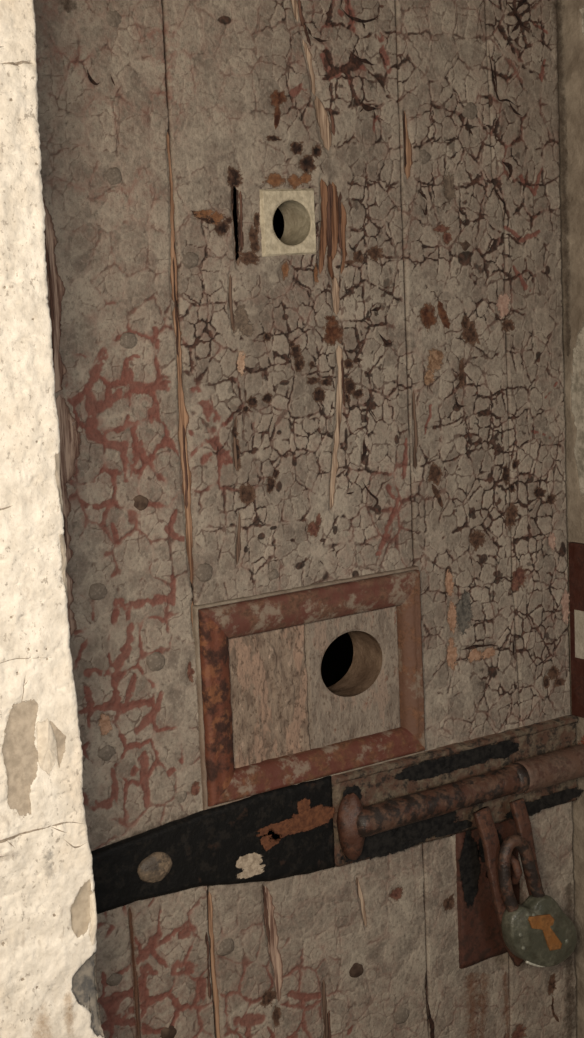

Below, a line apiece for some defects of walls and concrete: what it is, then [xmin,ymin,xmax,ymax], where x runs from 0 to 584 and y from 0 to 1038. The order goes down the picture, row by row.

crack [307,0,380,65]
crack [506,0,529,33]
crack [360,98,377,119]
crack [489,54,524,117]
crack [493,161,513,218]
crack [370,306,392,345]
crack [347,408,379,508]
crack [462,638,515,664]
spalling [2,699,66,818]
corrosion [256,798,335,852]
spalling [71,880,104,1037]